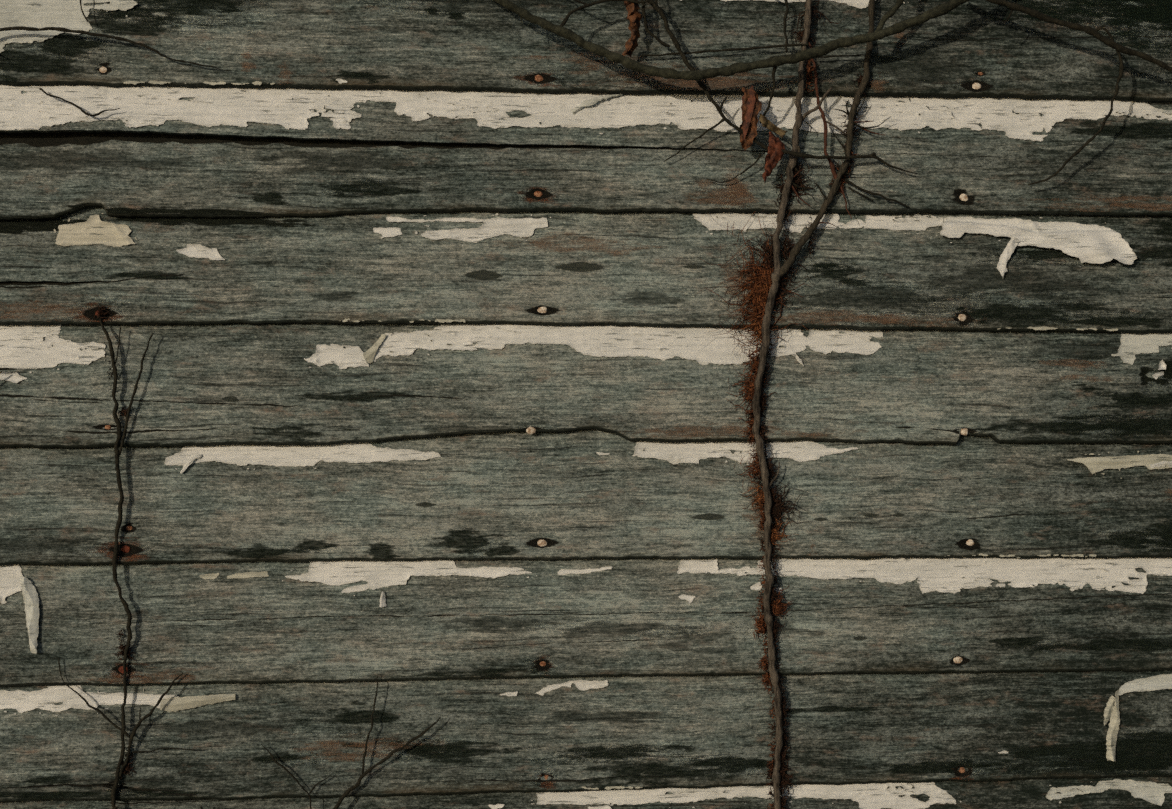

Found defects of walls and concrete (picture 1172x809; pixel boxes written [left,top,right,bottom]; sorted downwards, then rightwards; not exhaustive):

peeling [0,0,137,53]
peeling [0,78,743,134]
peeling [757,95,1172,141]
peeling [693,212,1137,278]
peeling [0,325,106,383]
peeling [304,319,883,369]
peeling [165,442,441,474]
peeling [633,440,861,465]
peeling [282,560,532,607]
peeling [677,553,1172,594]
peeling [0,685,236,716]
peeling [531,782,961,809]